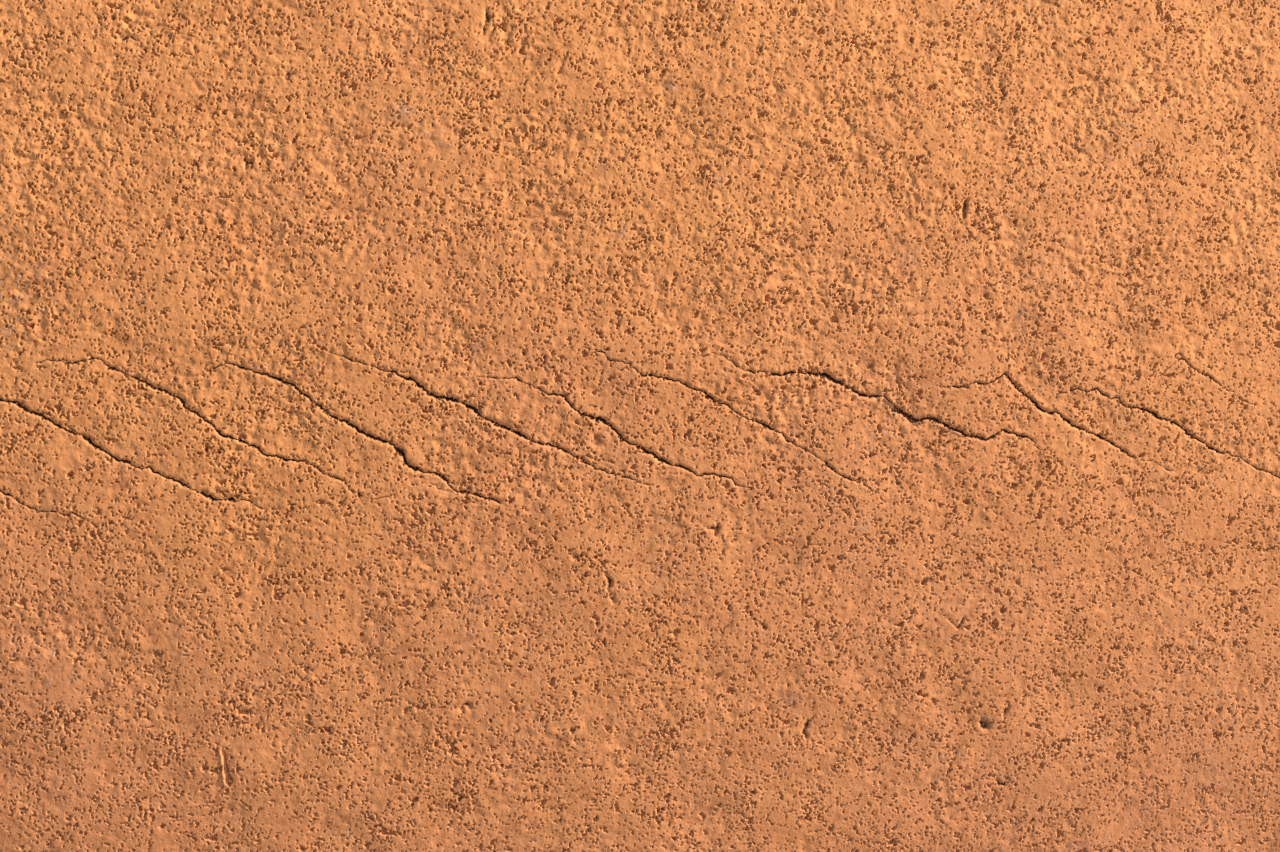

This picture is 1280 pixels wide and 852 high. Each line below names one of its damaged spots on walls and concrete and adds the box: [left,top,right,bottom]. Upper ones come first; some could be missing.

crack [0,490,84,519]
crack [0,399,264,509]
crack [36,357,390,505]
crack [201,363,500,503]
crack [333,353,751,488]
crack [581,346,873,492]
crack [702,352,1280,479]